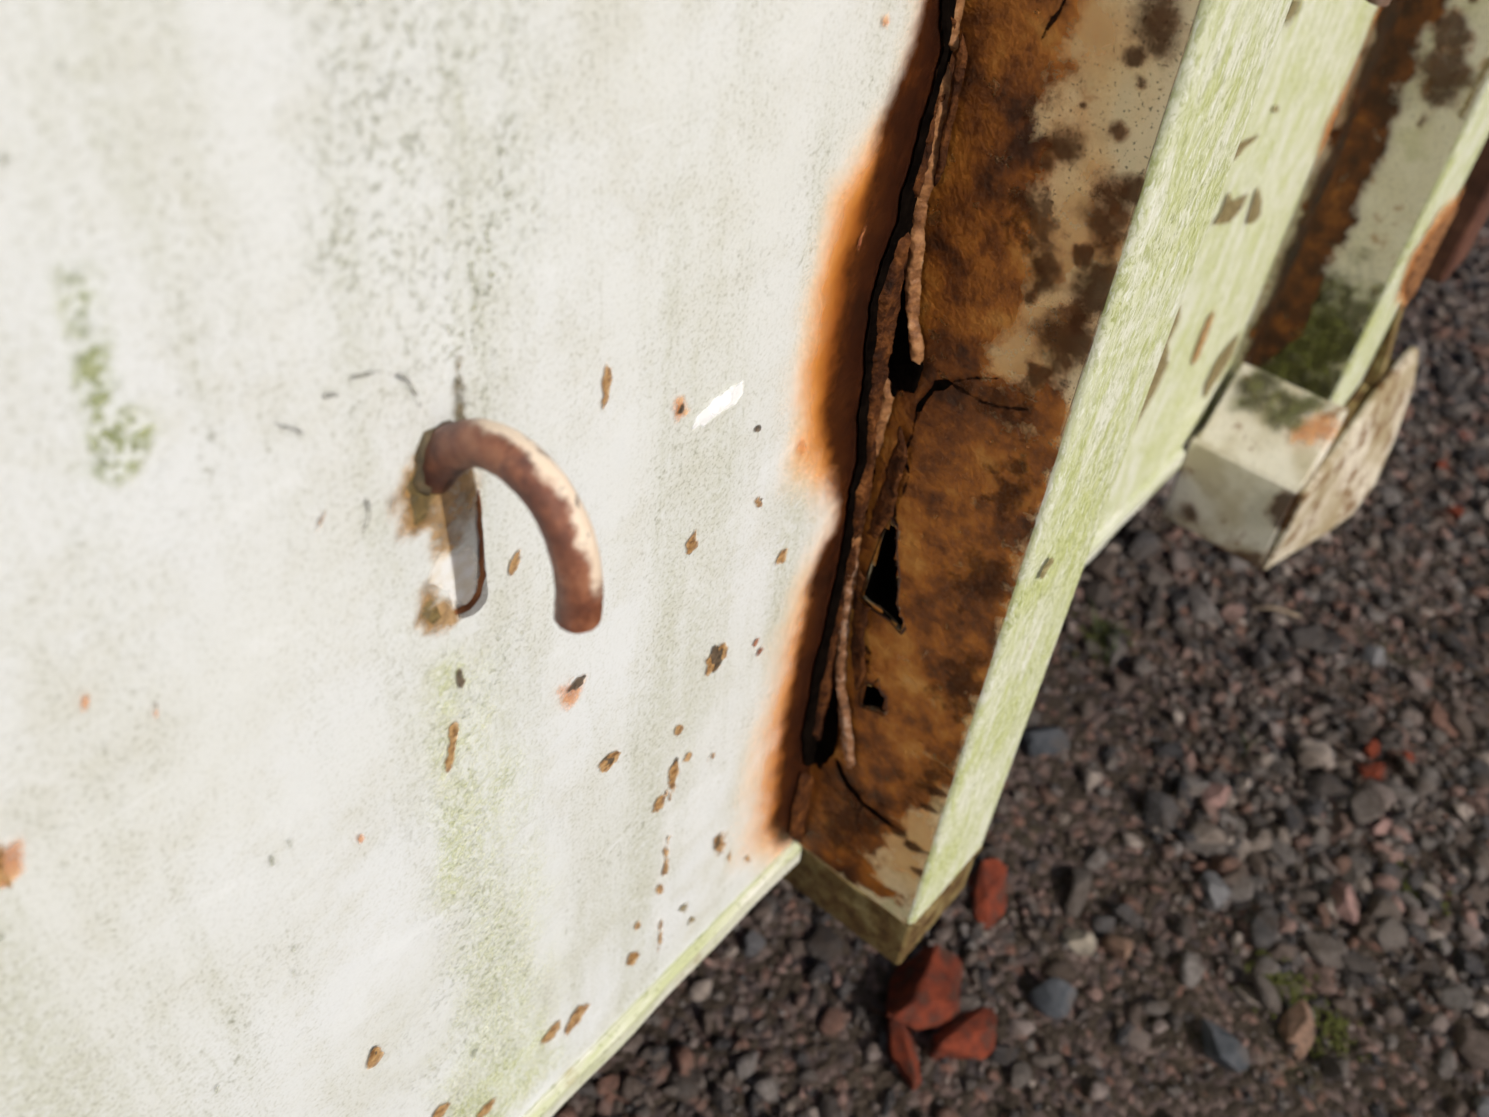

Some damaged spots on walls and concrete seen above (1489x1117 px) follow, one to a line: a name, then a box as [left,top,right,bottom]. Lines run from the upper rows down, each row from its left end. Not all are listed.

crack [1041,0,1066,39]
peeling [1214,187,1262,224]
peeling [1234,135,1258,160]
rust [1241,0,1477,369]
crack [789,0,1028,842]
rust [764,0,1145,904]
peeling [1135,305,1181,427]
peeling [1192,311,1241,398]
damp [1253,274,1384,402]
rust [395,468,486,633]
peeling [0,845,21,888]